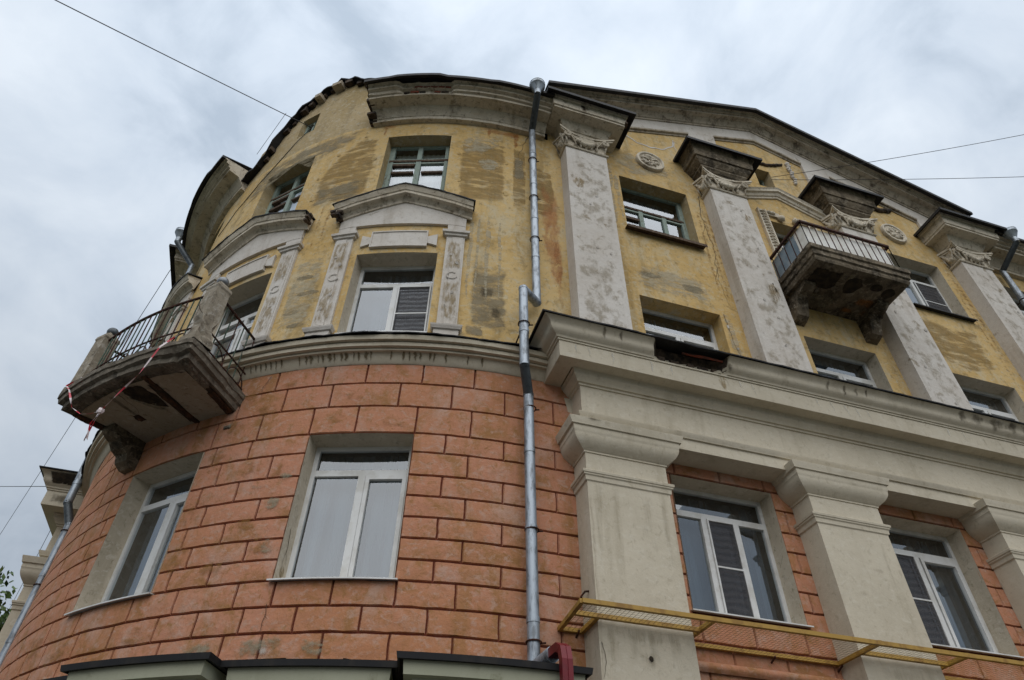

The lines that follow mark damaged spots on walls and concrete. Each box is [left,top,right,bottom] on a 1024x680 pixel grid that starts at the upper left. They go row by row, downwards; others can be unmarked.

peeling [245,85,377,225]
peeling [458,138,554,214]
spalling [808,267,863,294]
spalling [654,316,742,373]
spalling [114,375,200,423]